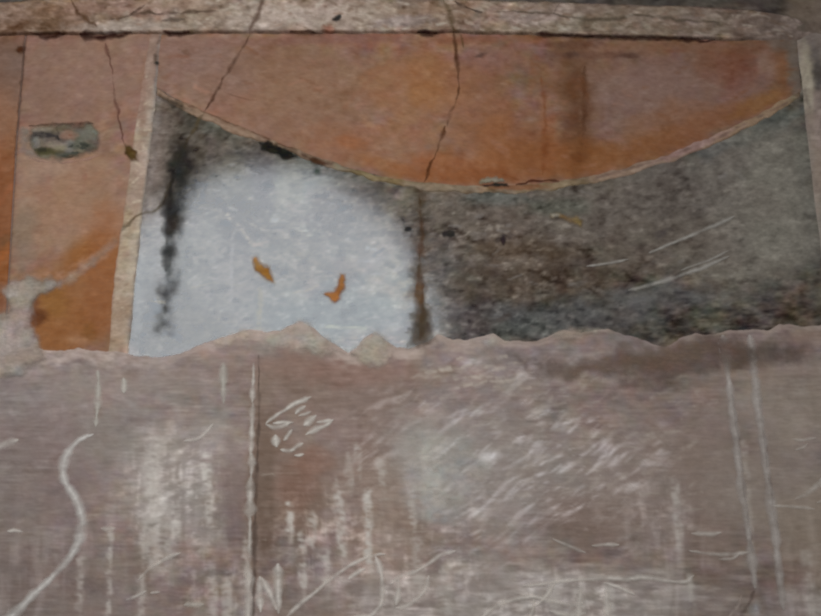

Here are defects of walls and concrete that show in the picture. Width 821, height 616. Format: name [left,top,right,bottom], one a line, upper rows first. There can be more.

crack [451,1,478,93]
crack [115,103,137,160]
corrosion [412,198,428,343]